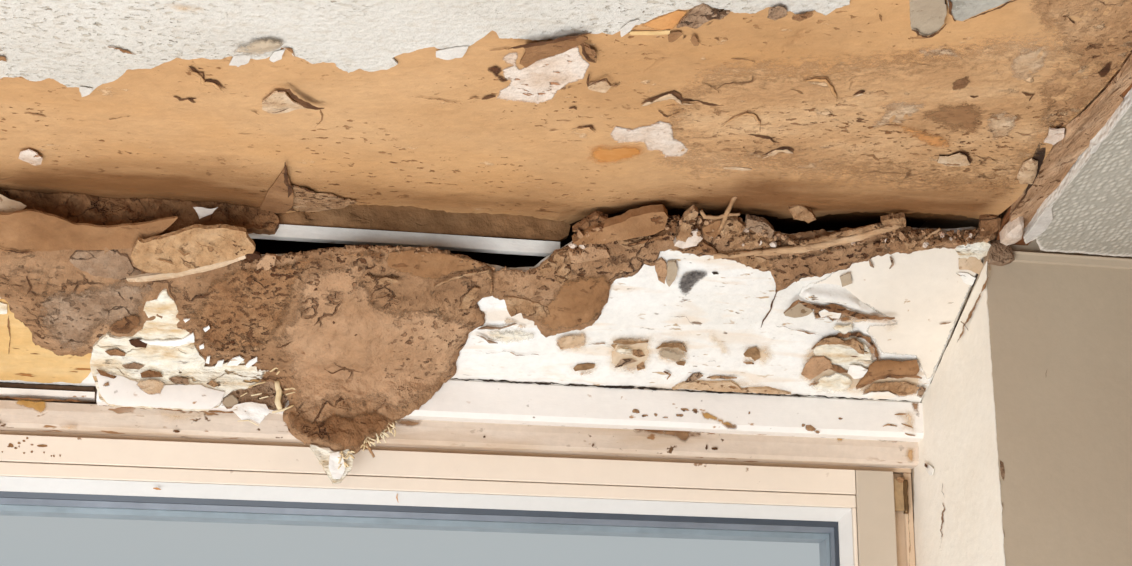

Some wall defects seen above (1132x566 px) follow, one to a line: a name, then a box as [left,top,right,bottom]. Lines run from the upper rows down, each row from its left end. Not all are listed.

flaking render [878,102,917,125]
flaking render [988,113,1016,139]
flaking render [1058,100,1090,129]
flaking render [937,151,972,166]
flaking render [69,247,148,280]
peeling [655,258,678,287]
peeling [478,320,516,330]
peeling [0,289,266,411]
peeling [801,332,926,436]
peeling [222,381,294,426]
peeling [632,408,736,429]
spalling [310,445,355,484]